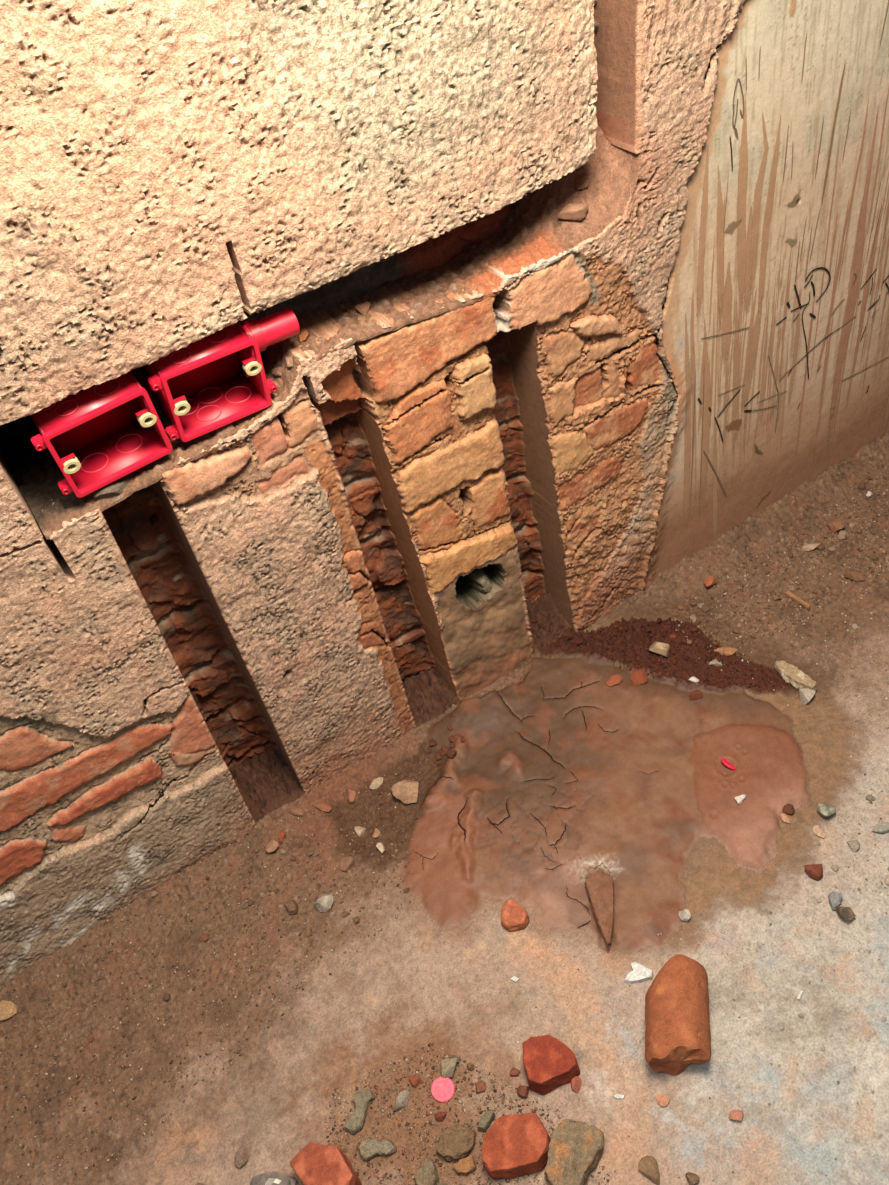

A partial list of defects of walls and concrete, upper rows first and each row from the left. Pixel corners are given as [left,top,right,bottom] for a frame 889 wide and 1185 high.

water stain [795,61,851,283]
spalling [321,251,679,630]
water stain [690,359,705,514]
spalling [160,388,417,735]
spalling [0,691,227,896]